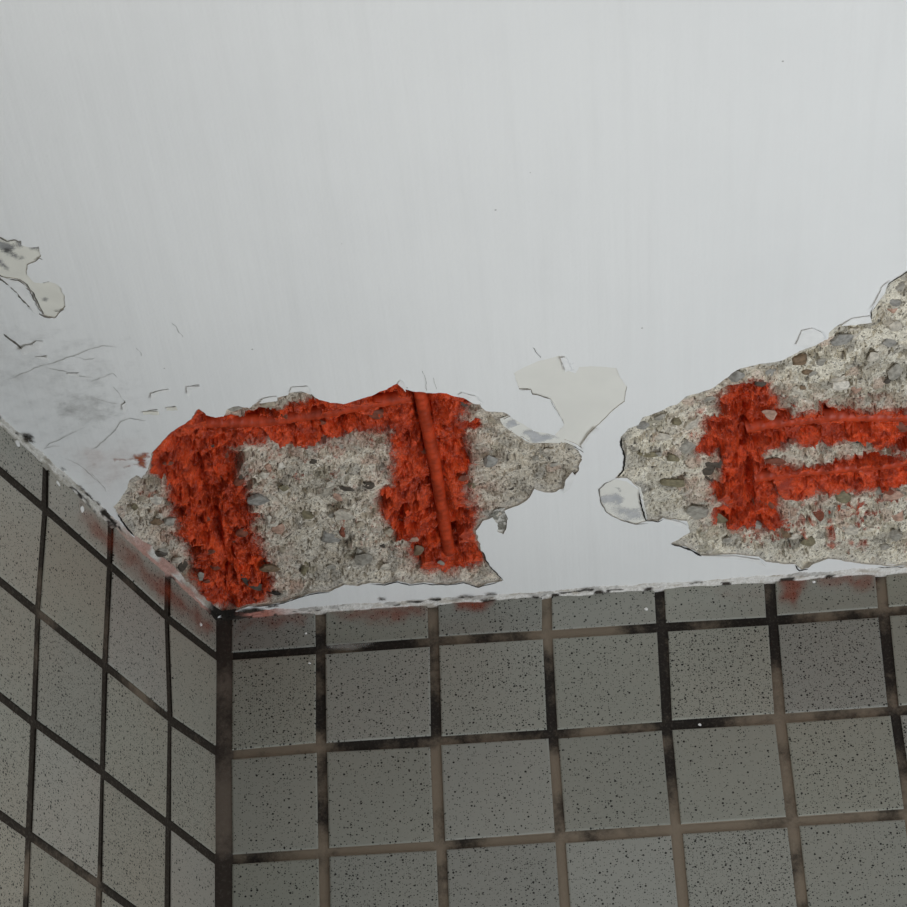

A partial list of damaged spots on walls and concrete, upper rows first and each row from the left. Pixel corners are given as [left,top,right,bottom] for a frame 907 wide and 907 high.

peeling [0,237,65,318]
crack [11,346,144,491]
spalling [114,356,627,610]
spalling [598,272,907,571]